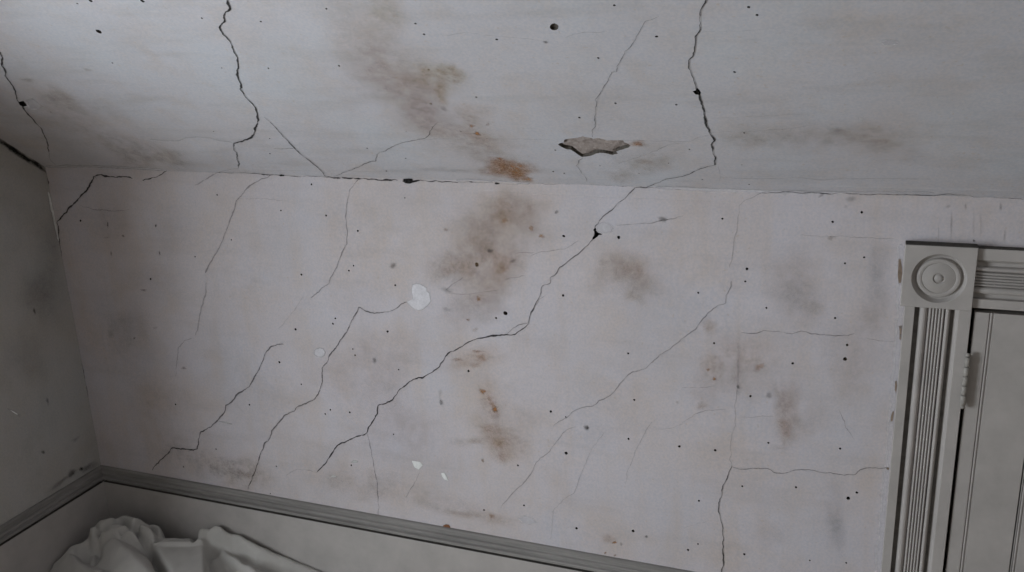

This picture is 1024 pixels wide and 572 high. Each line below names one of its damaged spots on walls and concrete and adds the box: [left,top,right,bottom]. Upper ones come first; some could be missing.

crack [0,52,49,152]
crack [219,0,437,181]
flaking render [558,136,630,157]
crack [317,0,716,472]
crack [152,344,284,470]
crack [248,302,405,487]
crack [718,467,882,572]